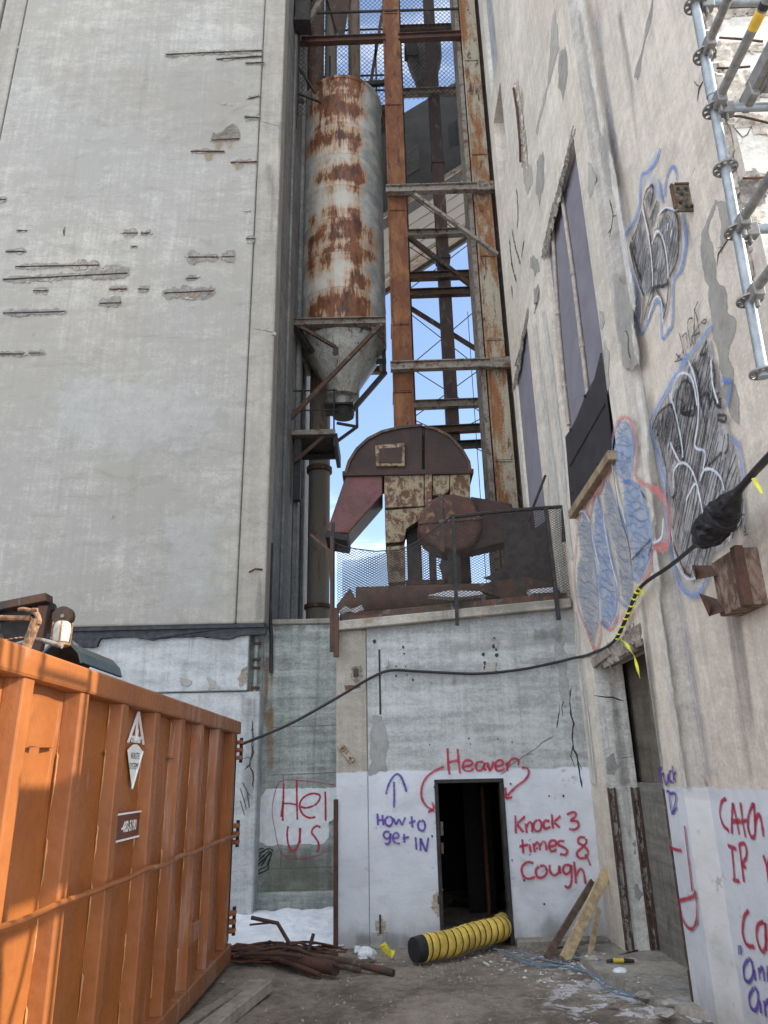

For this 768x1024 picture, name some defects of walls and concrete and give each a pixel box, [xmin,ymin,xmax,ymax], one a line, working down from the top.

spalling [165,48,265,65]
spalling [191,114,260,164]
spalling [120,228,153,249]
spalling [2,248,150,308]
spalling [162,249,235,301]
spalling [2,307,66,318]
spalling [0,349,47,357]
crack [501,690,624,786]